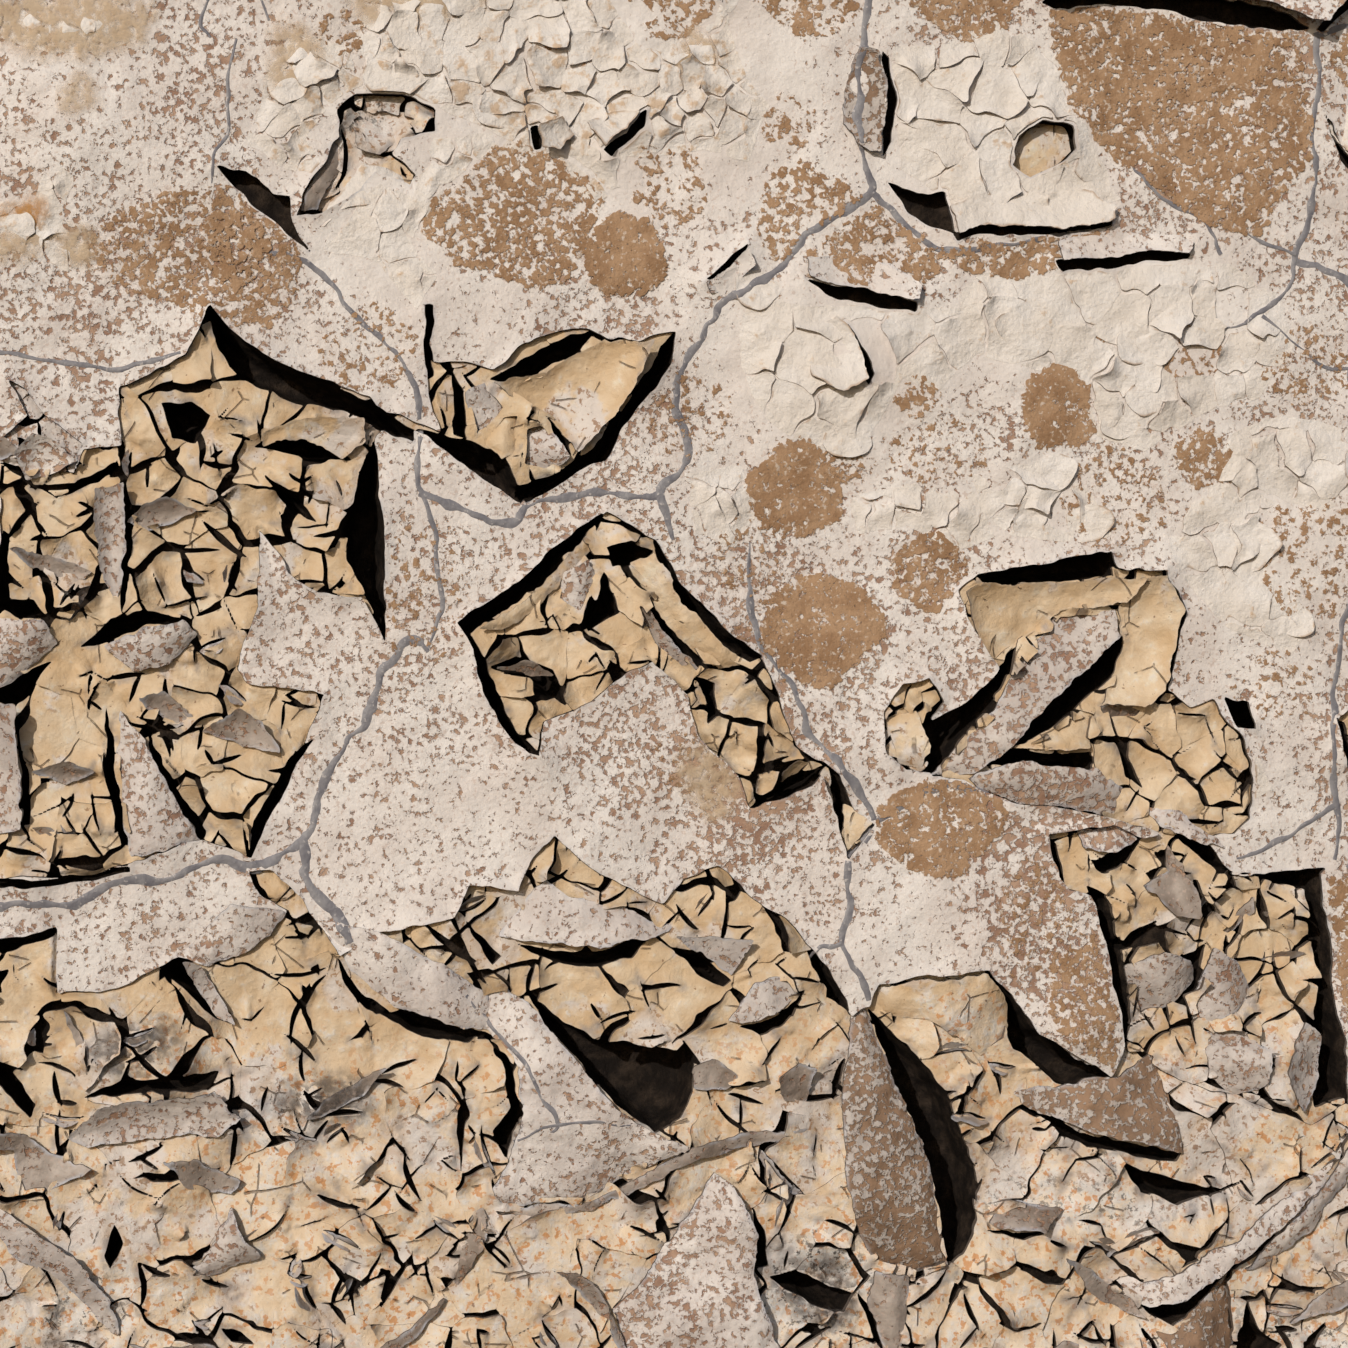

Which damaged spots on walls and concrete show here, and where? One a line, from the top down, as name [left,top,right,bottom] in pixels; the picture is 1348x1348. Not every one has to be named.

peeling [0,0,770,889]
crack [0,0,1111,1001]
peeling [0,414,1348,1348]
crack [1128,24,1348,381]
crack [1237,604,1348,869]